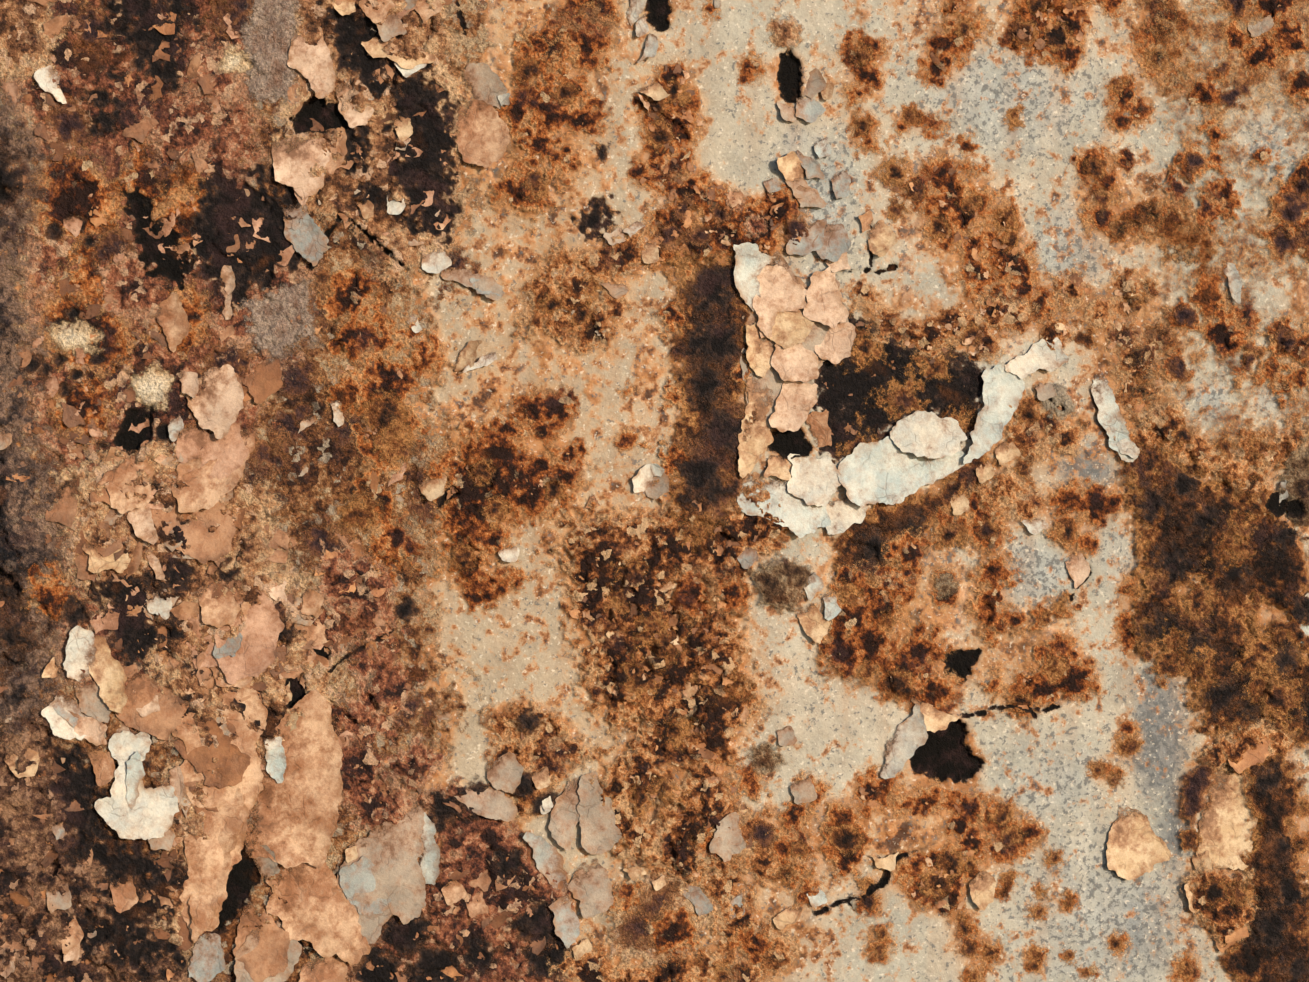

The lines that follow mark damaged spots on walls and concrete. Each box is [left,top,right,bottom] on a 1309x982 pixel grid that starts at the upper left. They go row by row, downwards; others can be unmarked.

spalling [44,214,96,247]
spalling [119,0,511,353]
spalling [627,0,672,63]
spalling [776,49,804,103]
rust [0,0,832,982]
peeling [570,169,1069,644]
rust [814,0,1309,982]
spalling [5,350,489,982]
peeling [454,752,666,959]
peeling [709,812,746,862]
spalling [880,699,985,784]
crack [962,703,1060,719]